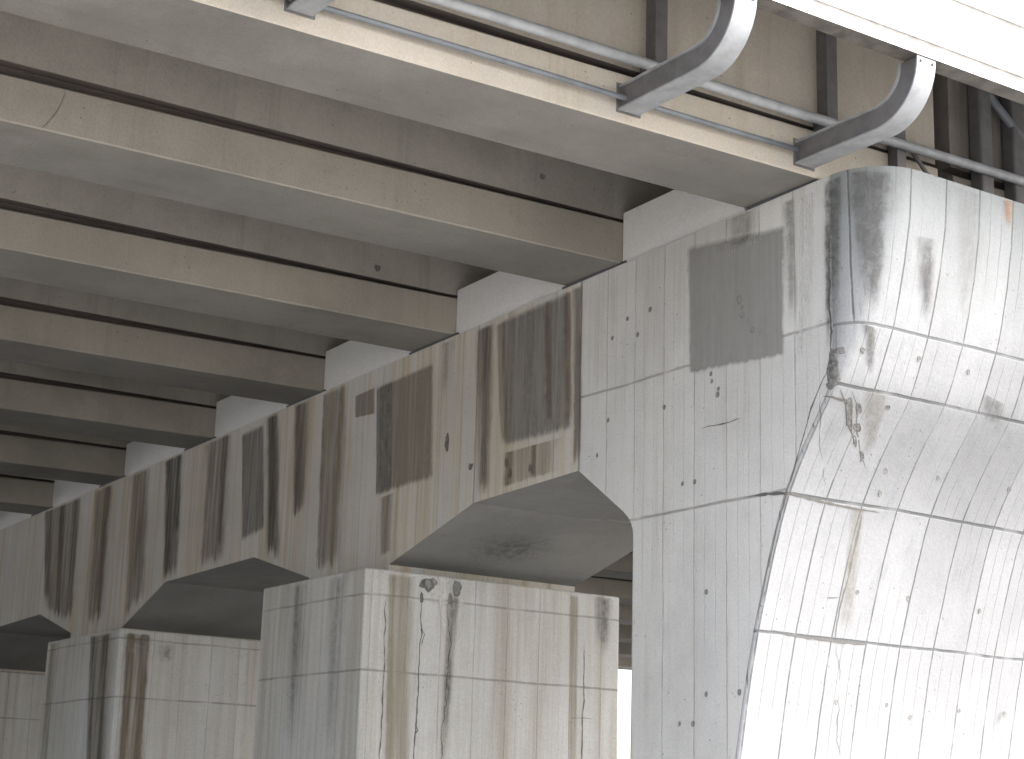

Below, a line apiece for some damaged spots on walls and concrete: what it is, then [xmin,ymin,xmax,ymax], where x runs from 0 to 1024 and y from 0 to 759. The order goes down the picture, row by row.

crack [826,225,834,347]
damp [827,179,838,303]
damp [565,289,581,457]
spalling [826,347,846,390]
spalling [846,398,864,462]
damp [45,501,78,612]
damp [165,455,181,573]
spalling [419,578,438,603]
spalling [448,580,462,605]
damp [89,635,109,759]
damp [120,639,146,759]
crack [413,600,452,759]